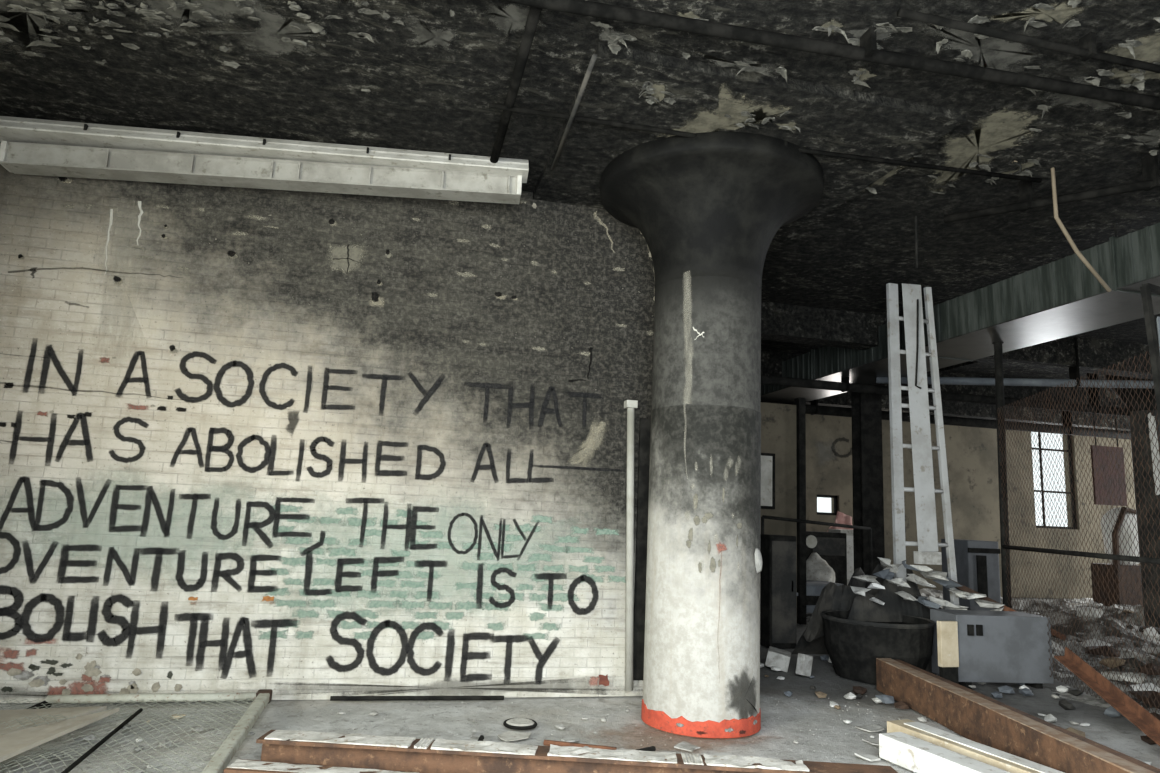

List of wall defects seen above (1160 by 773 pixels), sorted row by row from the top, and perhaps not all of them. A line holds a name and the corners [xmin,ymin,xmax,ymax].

peeling [0,0,458,68]
peeling [486,3,542,46]
peeling [590,21,637,55]
peeling [677,11,708,21]
peeling [812,0,1086,72]
peeling [639,81,676,105]
peeling [658,84,800,137]
peeling [682,48,787,82]
peeling [848,68,877,88]
peeling [924,17,1160,194]
peeling [861,155,922,194]
peeling [0,639,182,695]